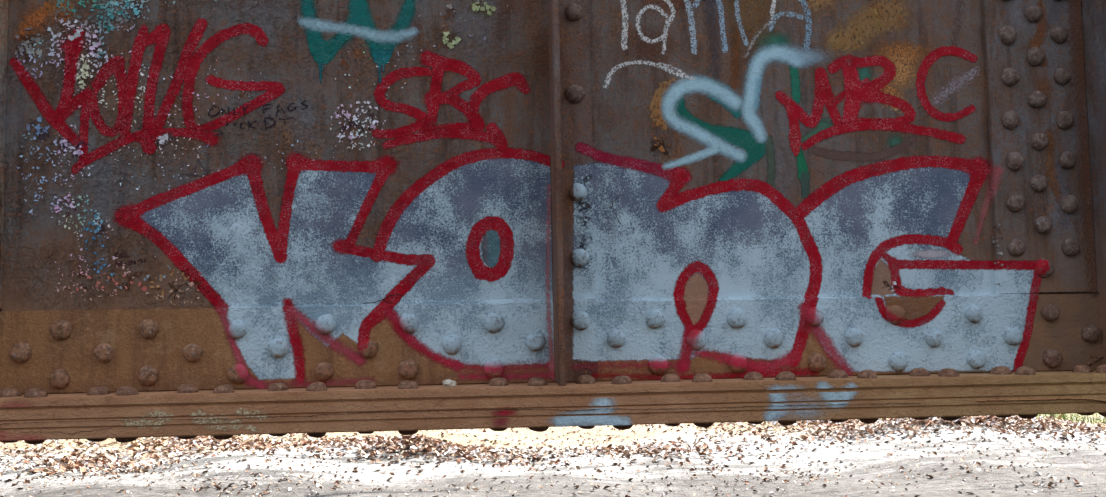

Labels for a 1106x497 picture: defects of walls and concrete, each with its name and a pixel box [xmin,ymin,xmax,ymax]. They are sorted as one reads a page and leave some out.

rust [14,0,74,41]
rust [631,29,663,57]
rust [727,0,777,91]
rust [827,0,926,113]
rust [649,77,686,130]